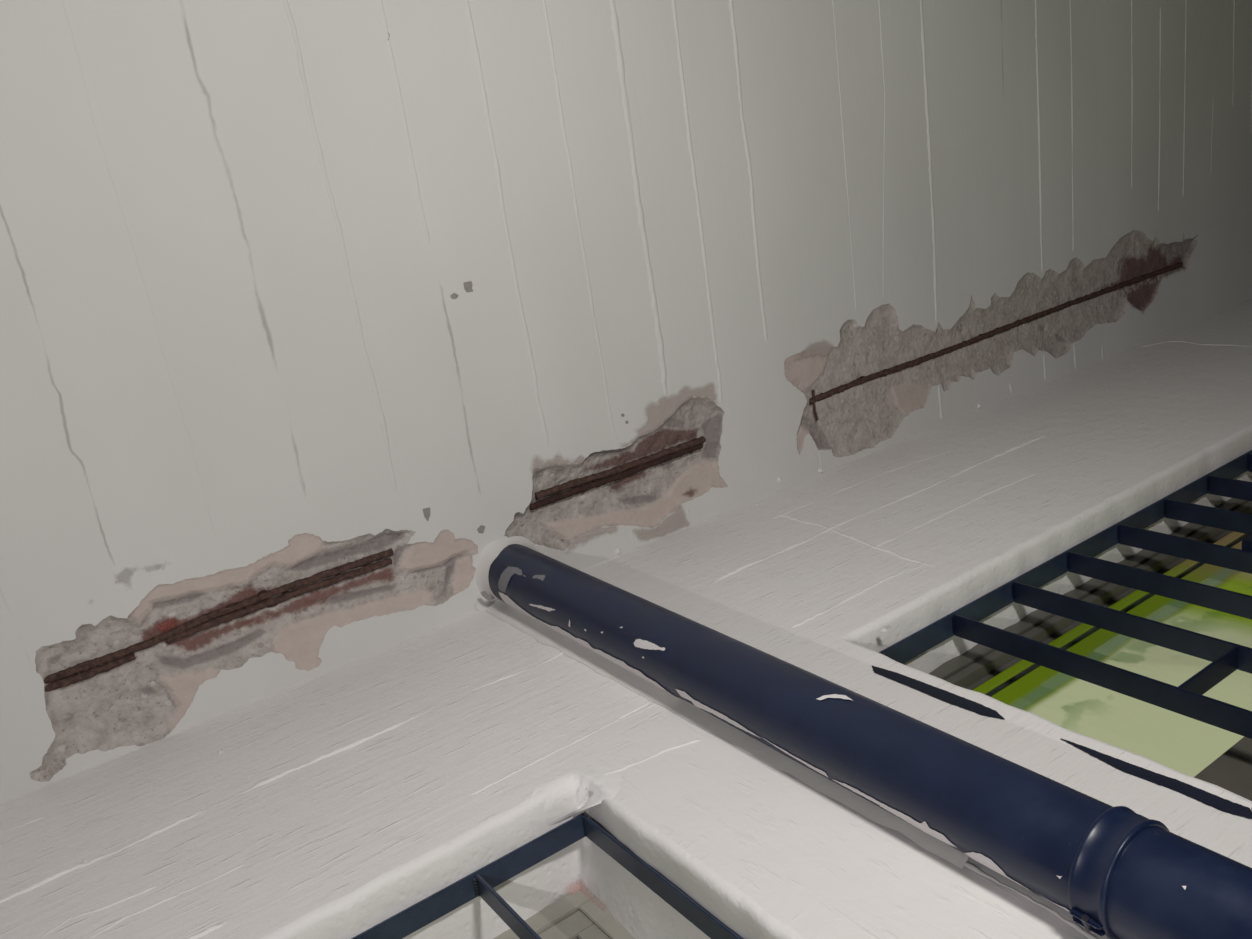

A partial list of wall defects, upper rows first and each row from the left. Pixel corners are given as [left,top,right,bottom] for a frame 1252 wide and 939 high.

spalling [784,230,1198,458]
spalling [504,384,728,551]
spalling [29,525,485,782]